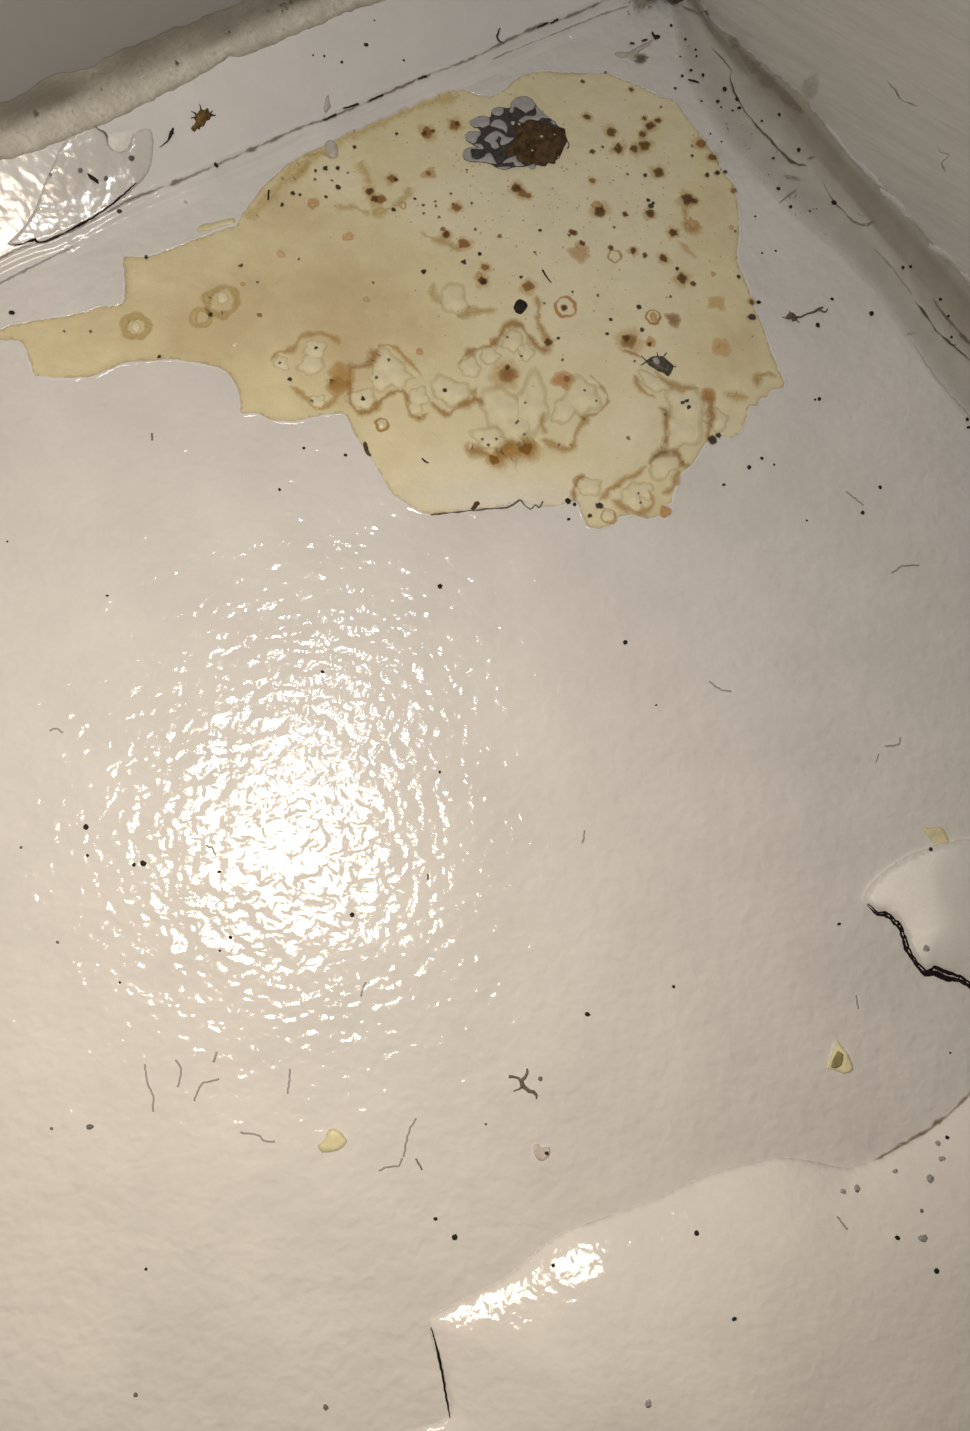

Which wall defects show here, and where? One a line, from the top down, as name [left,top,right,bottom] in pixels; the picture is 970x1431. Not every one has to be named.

damp [0,69,787,531]